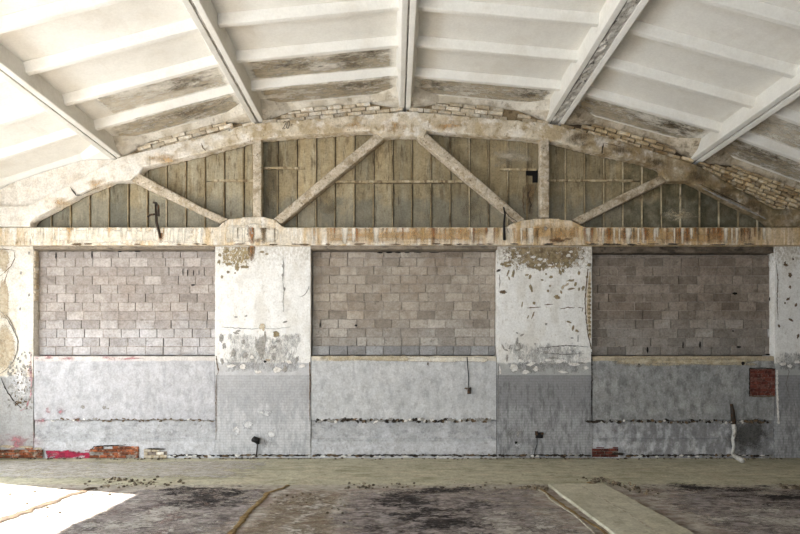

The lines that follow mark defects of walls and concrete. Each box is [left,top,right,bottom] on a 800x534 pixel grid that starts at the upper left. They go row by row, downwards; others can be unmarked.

water stain [251,51,389,78]
water stain [100,73,221,113]
water stain [263,78,391,102]
water stain [420,81,547,102]
water stain [117,96,238,136]
water stain [580,99,703,138]
peeling [217,225,278,279]
spalling [377,243,491,253]
peeling [496,243,640,374]
flaking render [0,248,40,411]
peeling [219,324,306,373]
spalling [51,405,214,422]